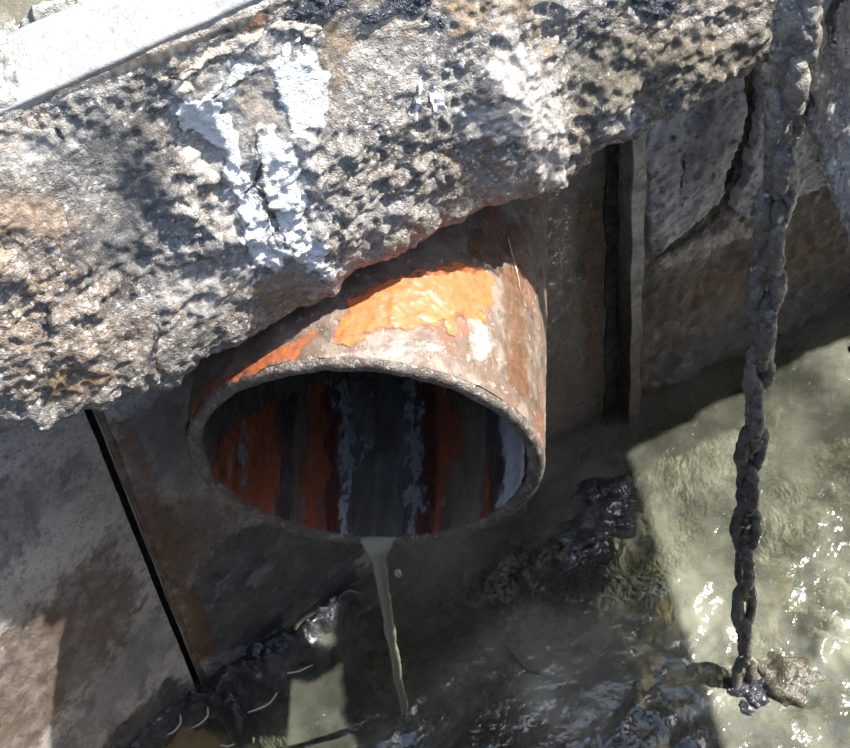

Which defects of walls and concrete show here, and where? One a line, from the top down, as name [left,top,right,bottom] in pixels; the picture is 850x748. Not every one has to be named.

damp [175,38,342,281]
crack [241,129,276,239]
crack [653,101,756,260]
efflorescence [188,279,221,318]
rust [321,379,345,533]
rust [413,380,438,535]